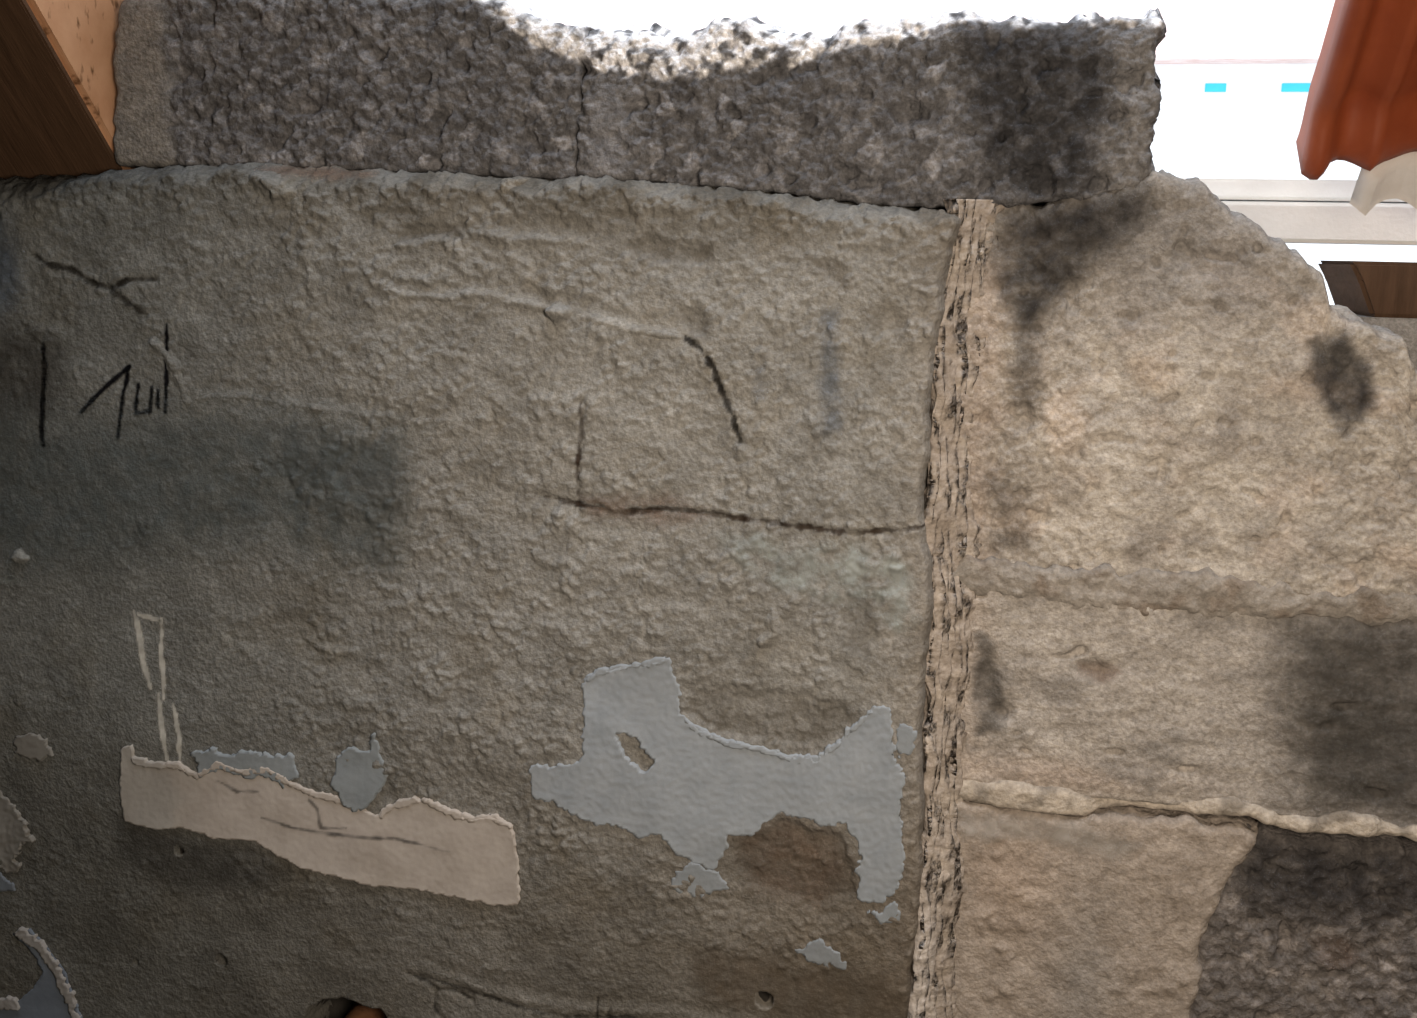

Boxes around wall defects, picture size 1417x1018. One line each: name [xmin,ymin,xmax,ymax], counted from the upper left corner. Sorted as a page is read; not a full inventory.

crack [685,336,742,442]
crack [563,418,925,535]
peeling [0,790,36,892]
peeling [119,732,521,906]
peeling [529,656,918,924]
peeling [0,926,83,1018]
peeling [795,938,847,970]